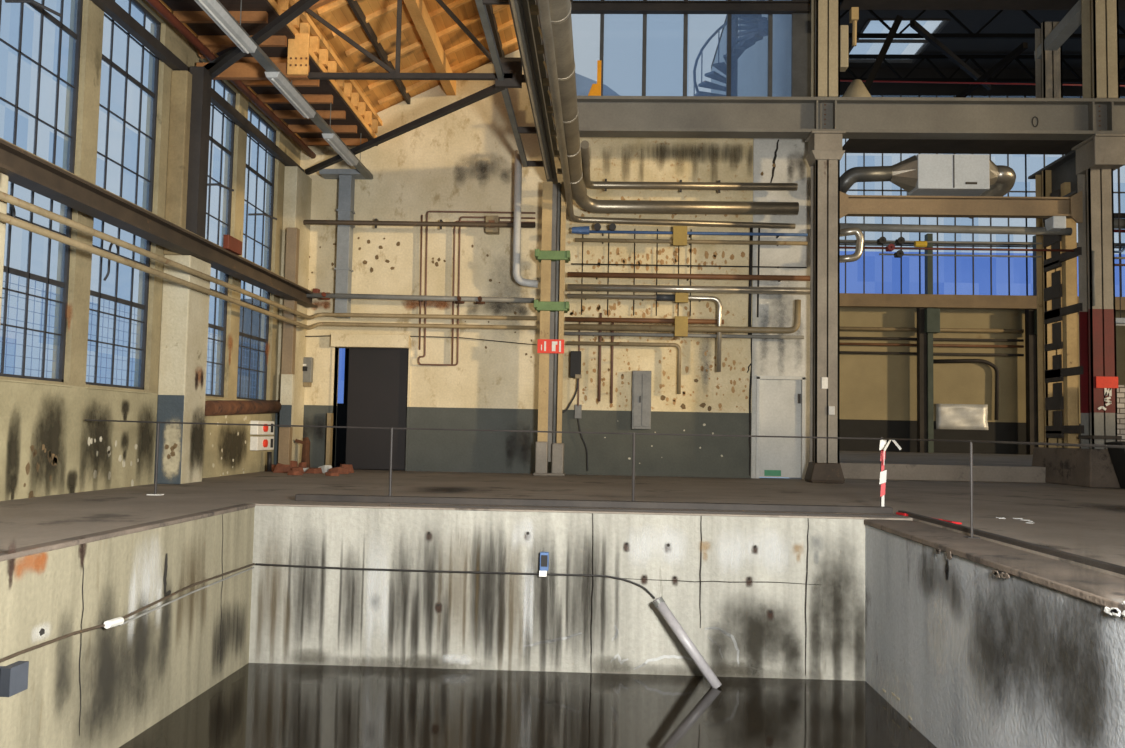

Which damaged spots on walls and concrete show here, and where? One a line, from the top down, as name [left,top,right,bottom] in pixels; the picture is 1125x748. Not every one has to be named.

water stain [7,422,18,500]
water stain [35,401,152,493]
water stain [191,415,205,465]
water stain [86,616,147,733]
water stain [161,595,170,658]
water stain [339,579,363,628]
water stain [389,559,447,649]
water stain [474,561,503,639]
spalling [0,503,1125,748]
water stain [525,561,604,659]
water stain [713,567,865,678]
water stain [977,590,1100,748]